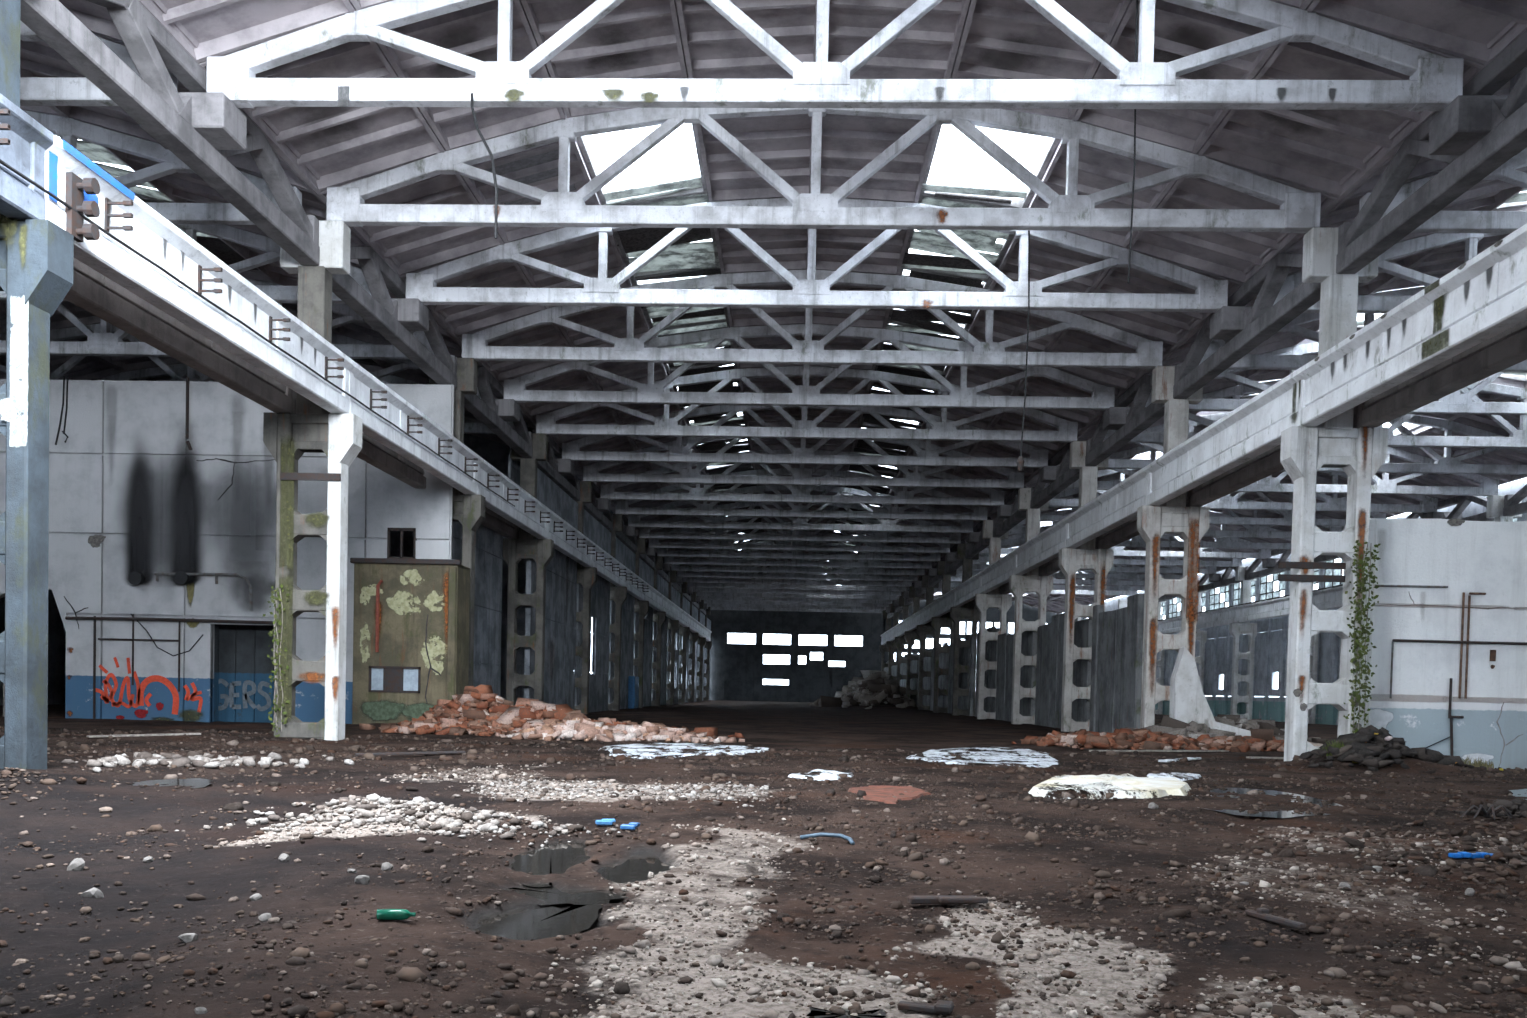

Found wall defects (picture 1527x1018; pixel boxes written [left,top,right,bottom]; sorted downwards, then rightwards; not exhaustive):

water stain [128,457,152,583]
water stain [172,449,199,628]
corrosion [1152,535,1160,590]
corrosion [1186,520,1200,655]
corrosion [1149,619,1157,692]